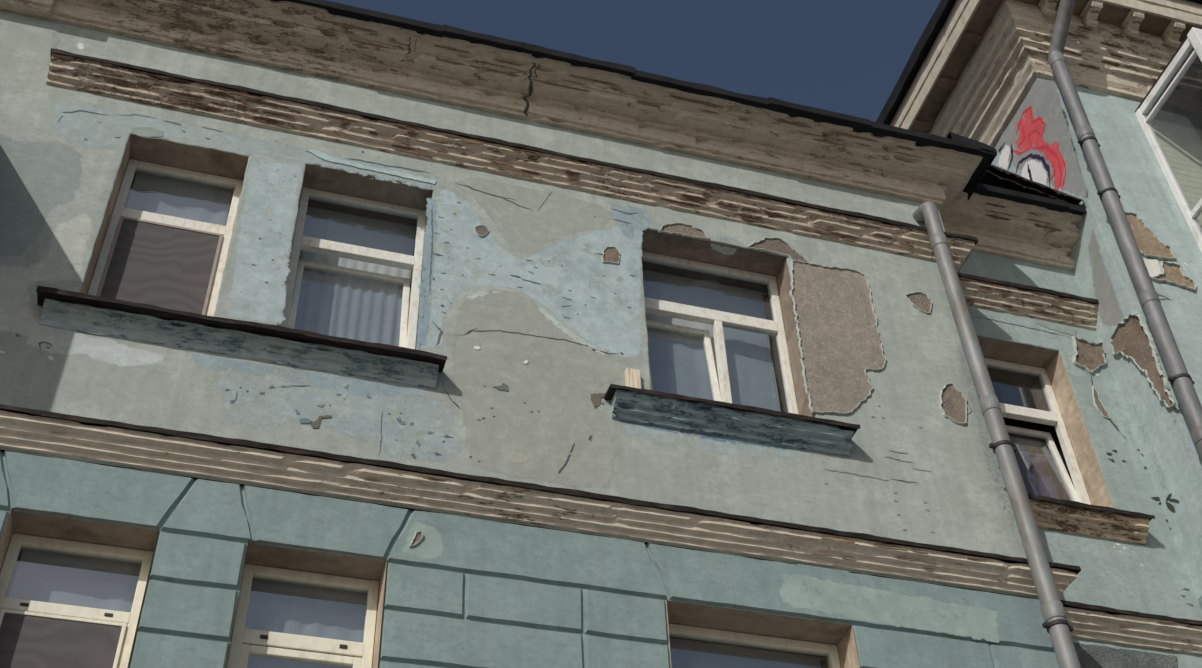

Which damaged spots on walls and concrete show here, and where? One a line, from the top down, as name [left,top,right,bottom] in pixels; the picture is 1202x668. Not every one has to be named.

crack [523,62,541,116]
peeling [434,45,724,114]
flaking render [50,91,643,358]
peeling [648,181,788,222]
peeling [812,211,914,246]
spalling [1124,211,1197,293]
crack [456,328,624,355]
spalling [651,223,887,419]
spalling [977,230,1177,422]
spalling [590,393,605,408]
spalling [939,383,972,426]
spalling [401,522,444,560]